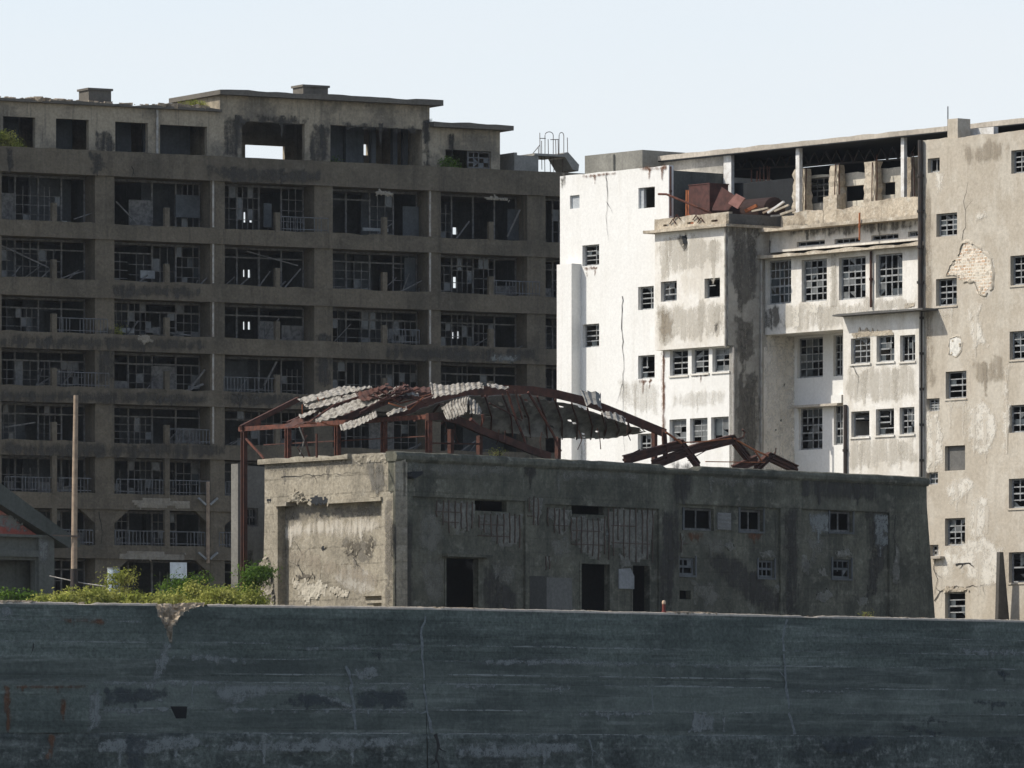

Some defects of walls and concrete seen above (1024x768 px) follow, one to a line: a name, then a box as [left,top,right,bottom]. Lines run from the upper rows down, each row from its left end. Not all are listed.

flaking render [945,239,995,358]
damp [729,223,780,460]
corrosion [639,355,665,428]
spalling [342,535,374,557]
spalling [435,500,524,549]
spalling [547,507,656,568]
peeling [153,603,205,631]
peeling [292,571,349,605]
crack [408,616,446,768]